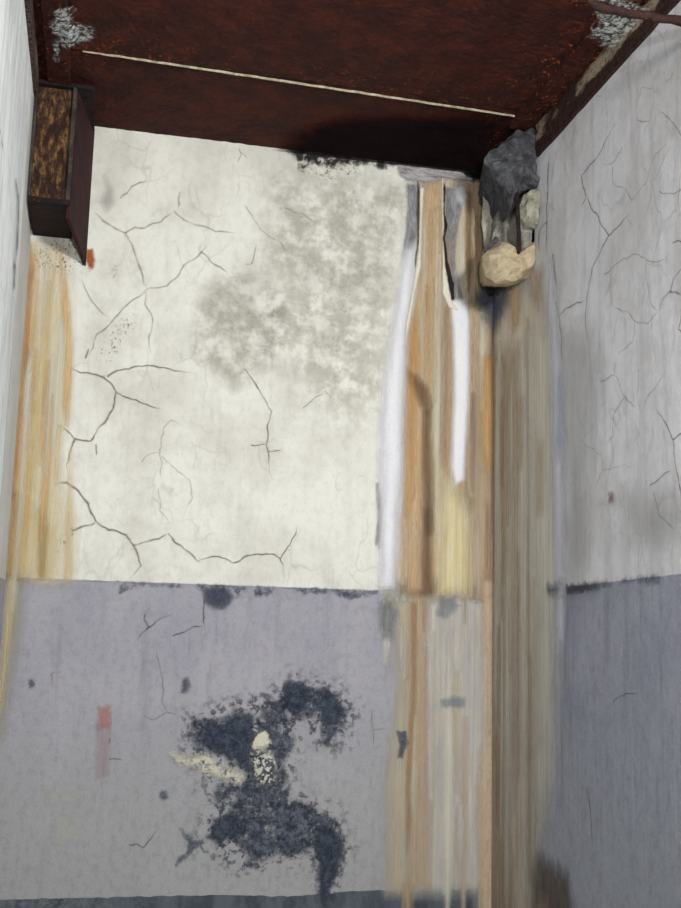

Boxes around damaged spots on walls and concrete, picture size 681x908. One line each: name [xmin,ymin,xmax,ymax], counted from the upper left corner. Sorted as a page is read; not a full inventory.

spalling [478,128,541,295]
crack [538,140,681,355]
rust [6,246,71,577]
crack [57,286,296,568]
rust [388,177,554,908]
damp [170,681,354,905]
damp [536,859,569,908]